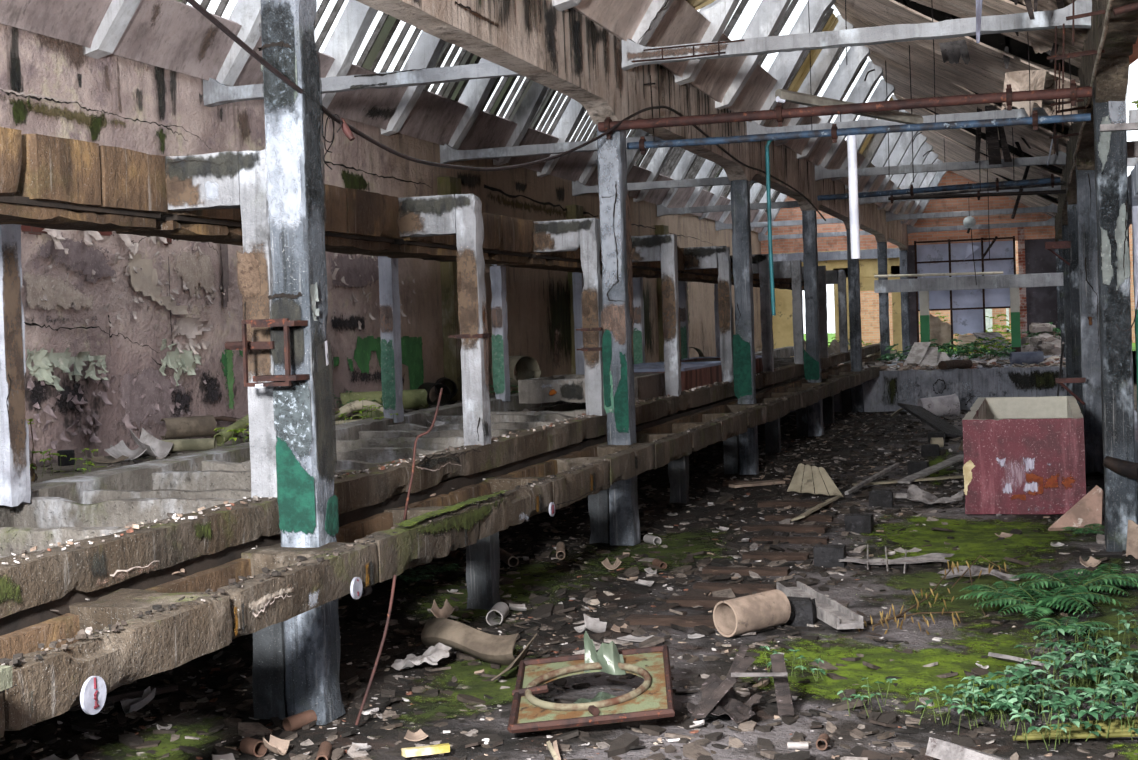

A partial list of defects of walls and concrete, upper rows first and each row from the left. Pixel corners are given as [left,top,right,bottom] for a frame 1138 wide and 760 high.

damp [9,27,24,94]
damp [38,34,86,88]
damp [104,57,121,112]
crack [0,87,232,166]
damp [155,66,177,120]
damp [467,0,746,157]
peeling [21,225,379,449]